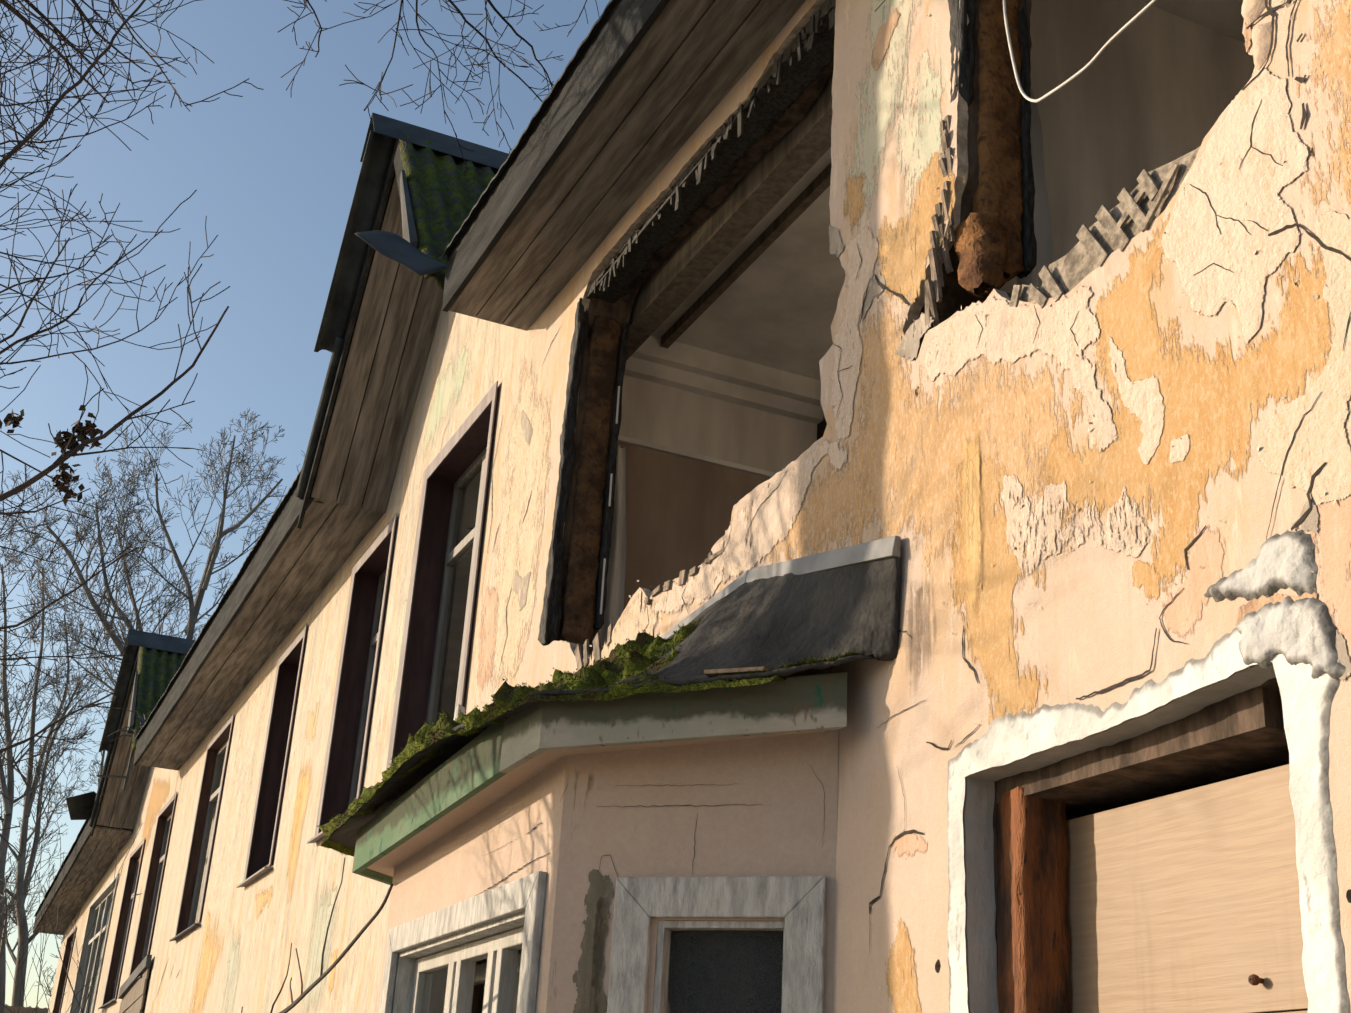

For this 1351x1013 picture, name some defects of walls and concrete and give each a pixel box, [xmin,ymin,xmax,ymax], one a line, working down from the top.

crack [1239,0,1311,169]
crack [1190,184,1351,276]
peeling [562,0,1351,726]
peeling [472,358,556,703]
crack [1076,526,1206,700]
crack [1266,393,1326,540]
crack [926,724,980,750]
crack [869,768,923,950]
peeling [893,830,928,859]
peeling [879,918,921,1013]